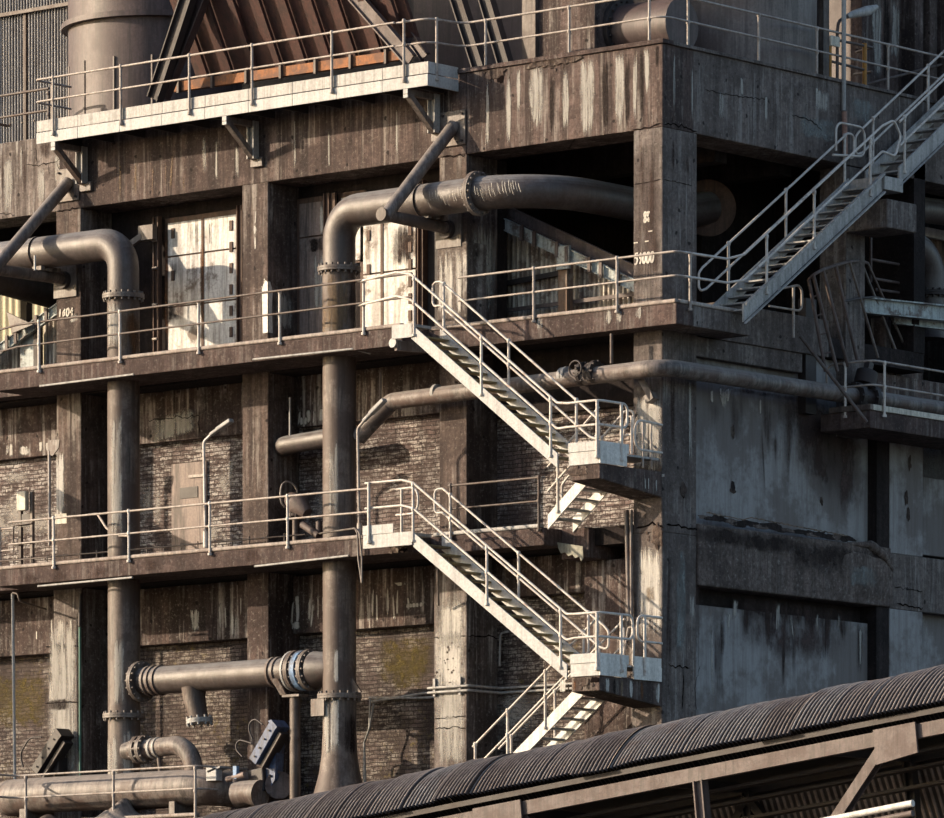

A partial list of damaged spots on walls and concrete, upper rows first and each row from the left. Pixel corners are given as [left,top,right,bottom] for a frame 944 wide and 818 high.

damp [506,69,569,139]
damp [581,46,658,132]
peeling [262,279,292,333]
spalling [698,512,856,542]
damp [667,554,699,656]
damp [711,600,845,684]